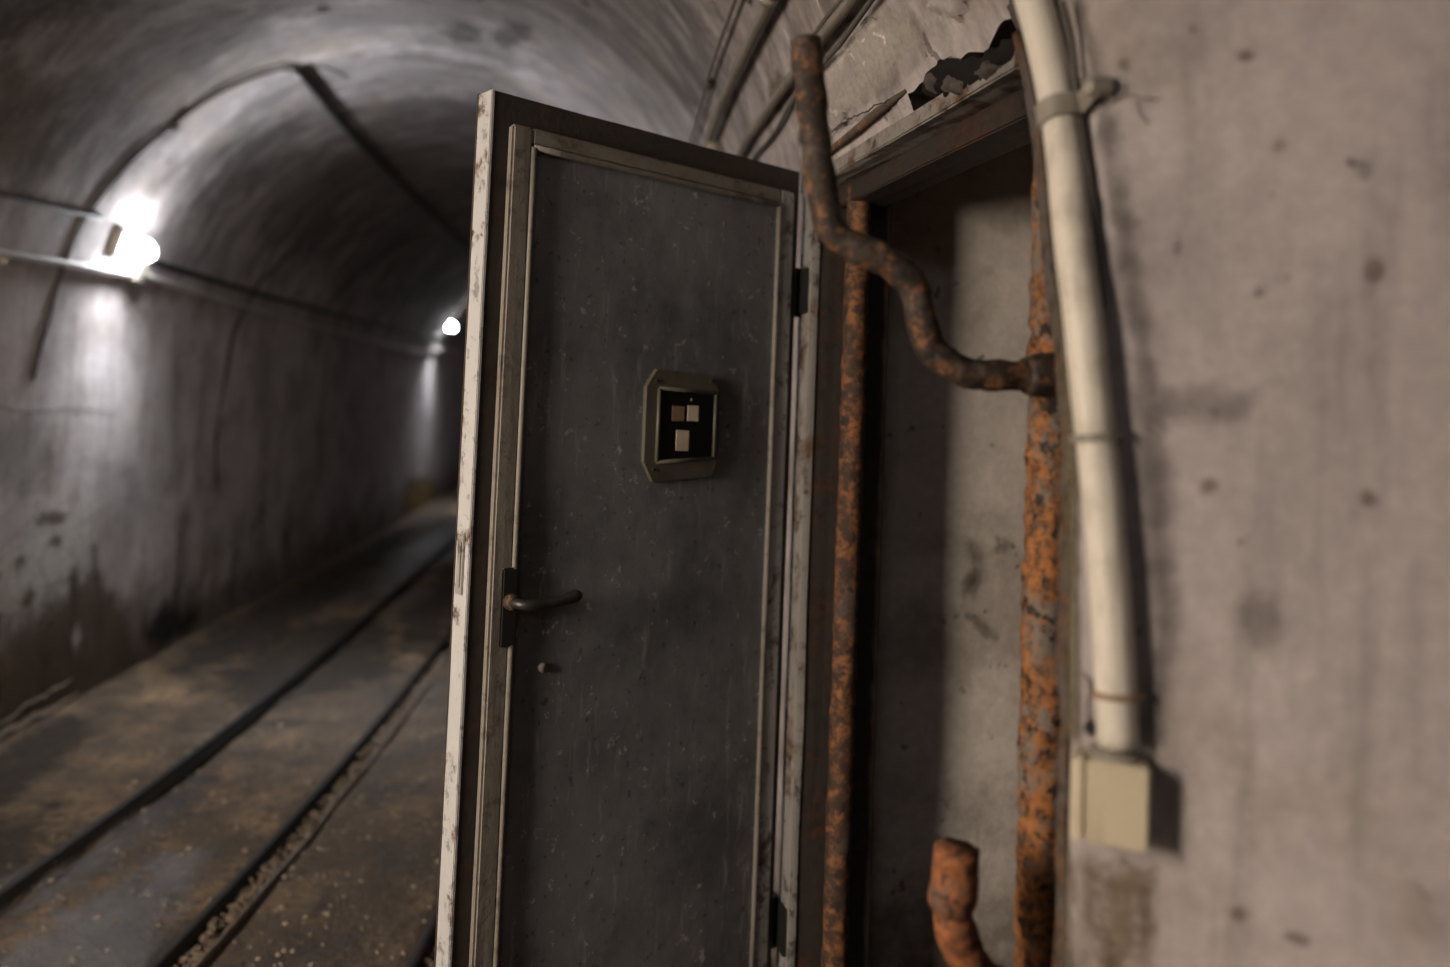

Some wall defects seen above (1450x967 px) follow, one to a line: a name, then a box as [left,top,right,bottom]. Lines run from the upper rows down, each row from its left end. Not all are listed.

spalling [922,0,1022,98]
damp [0,544,199,730]
damp [0,762,218,967]